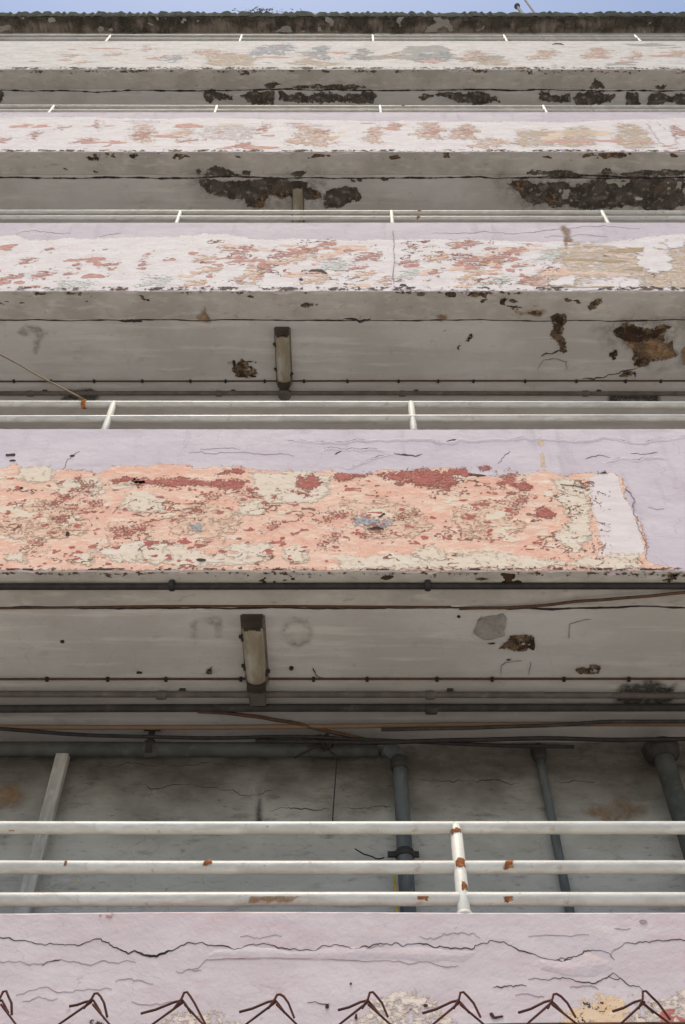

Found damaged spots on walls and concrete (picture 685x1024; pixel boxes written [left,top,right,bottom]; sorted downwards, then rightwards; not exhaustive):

peeling [0,41,685,105]
peeling [0,117,685,211]
peeling [0,233,685,356]
spalling [232,359,257,378]
spalling [583,321,678,380]
crack [191,435,685,474]
peeling [0,451,685,583]
spalling [488,635,535,661]
spalling [575,665,601,675]
crack [221,789,386,811]
crack [0,928,685,1005]